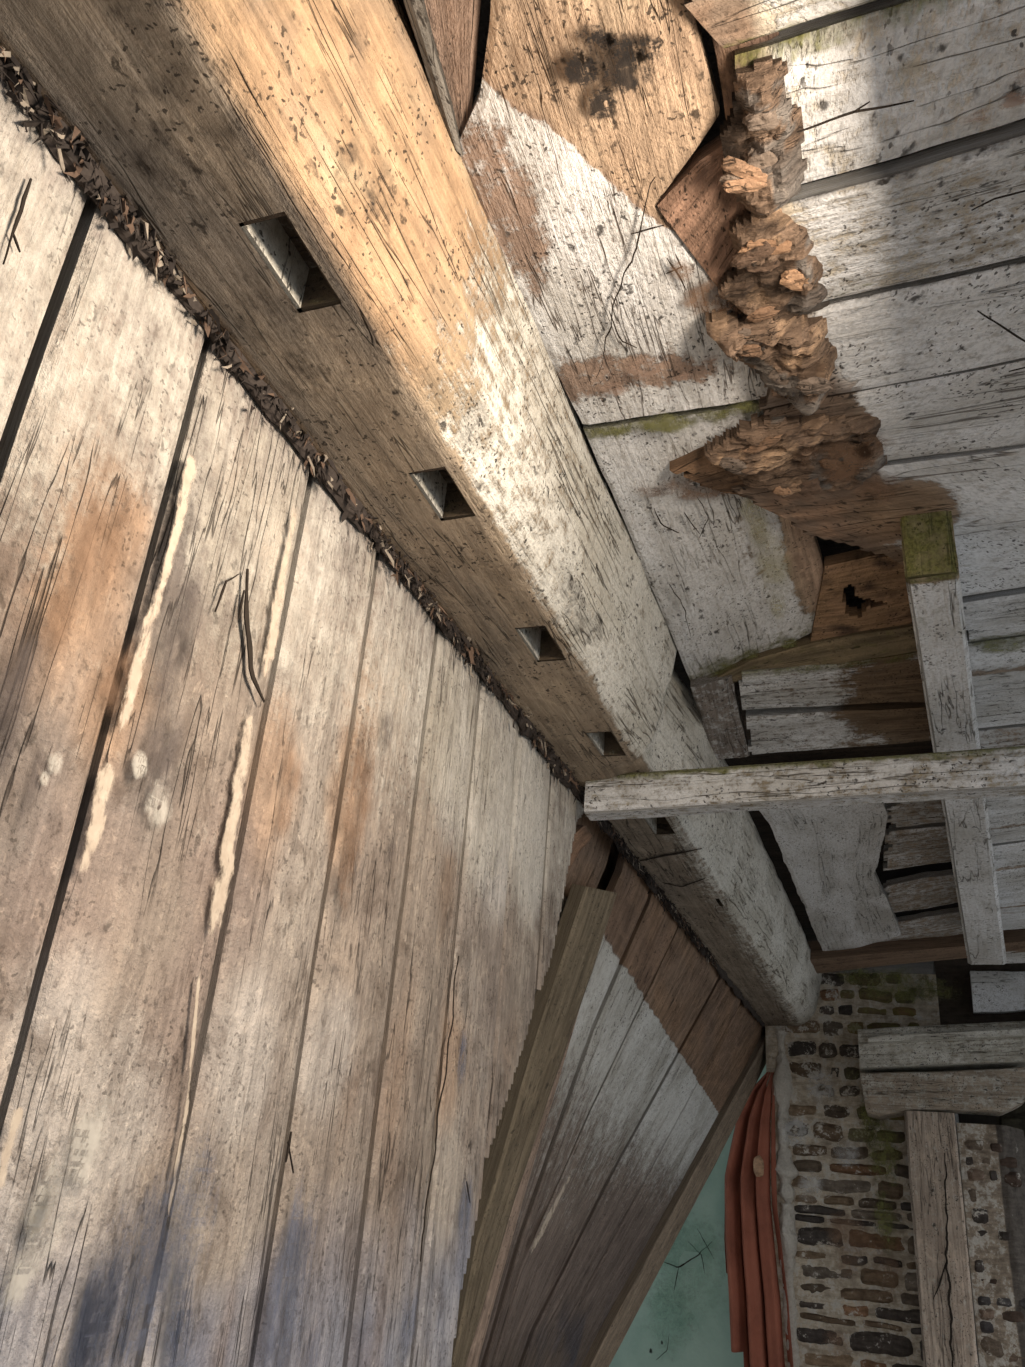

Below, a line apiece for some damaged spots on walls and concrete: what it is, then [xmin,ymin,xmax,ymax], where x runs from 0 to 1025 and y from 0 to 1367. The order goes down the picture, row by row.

damp [565,24,664,121]
peeling [742,110,779,131]
peeling [719,148,778,193]
peeling [730,239,809,291]
peeling [738,306,780,357]
peeling [795,377,833,394]
crack [214,568,265,703]